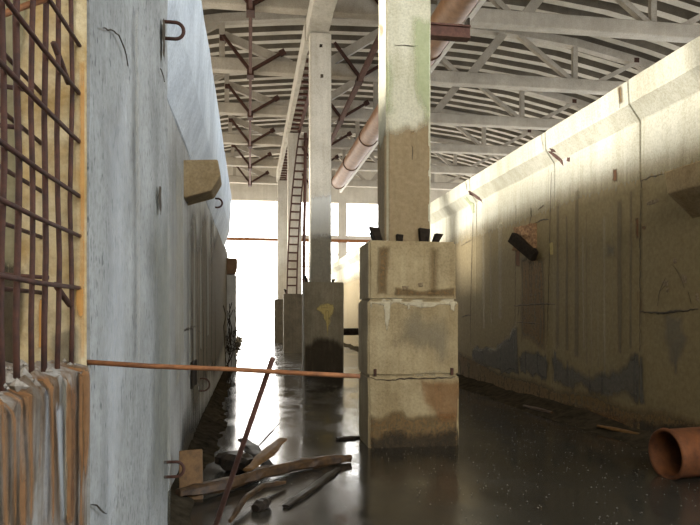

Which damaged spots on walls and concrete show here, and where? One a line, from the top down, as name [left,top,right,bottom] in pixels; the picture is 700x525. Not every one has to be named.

crack [103,27,128,66]
rust [0,389,41,525]
rust [37,377,54,519]
rust [63,360,360,525]
water stain [305,276,361,373]
crack [369,374,456,382]
water stain [370,412,458,448]
water stain [370,154,700,432]